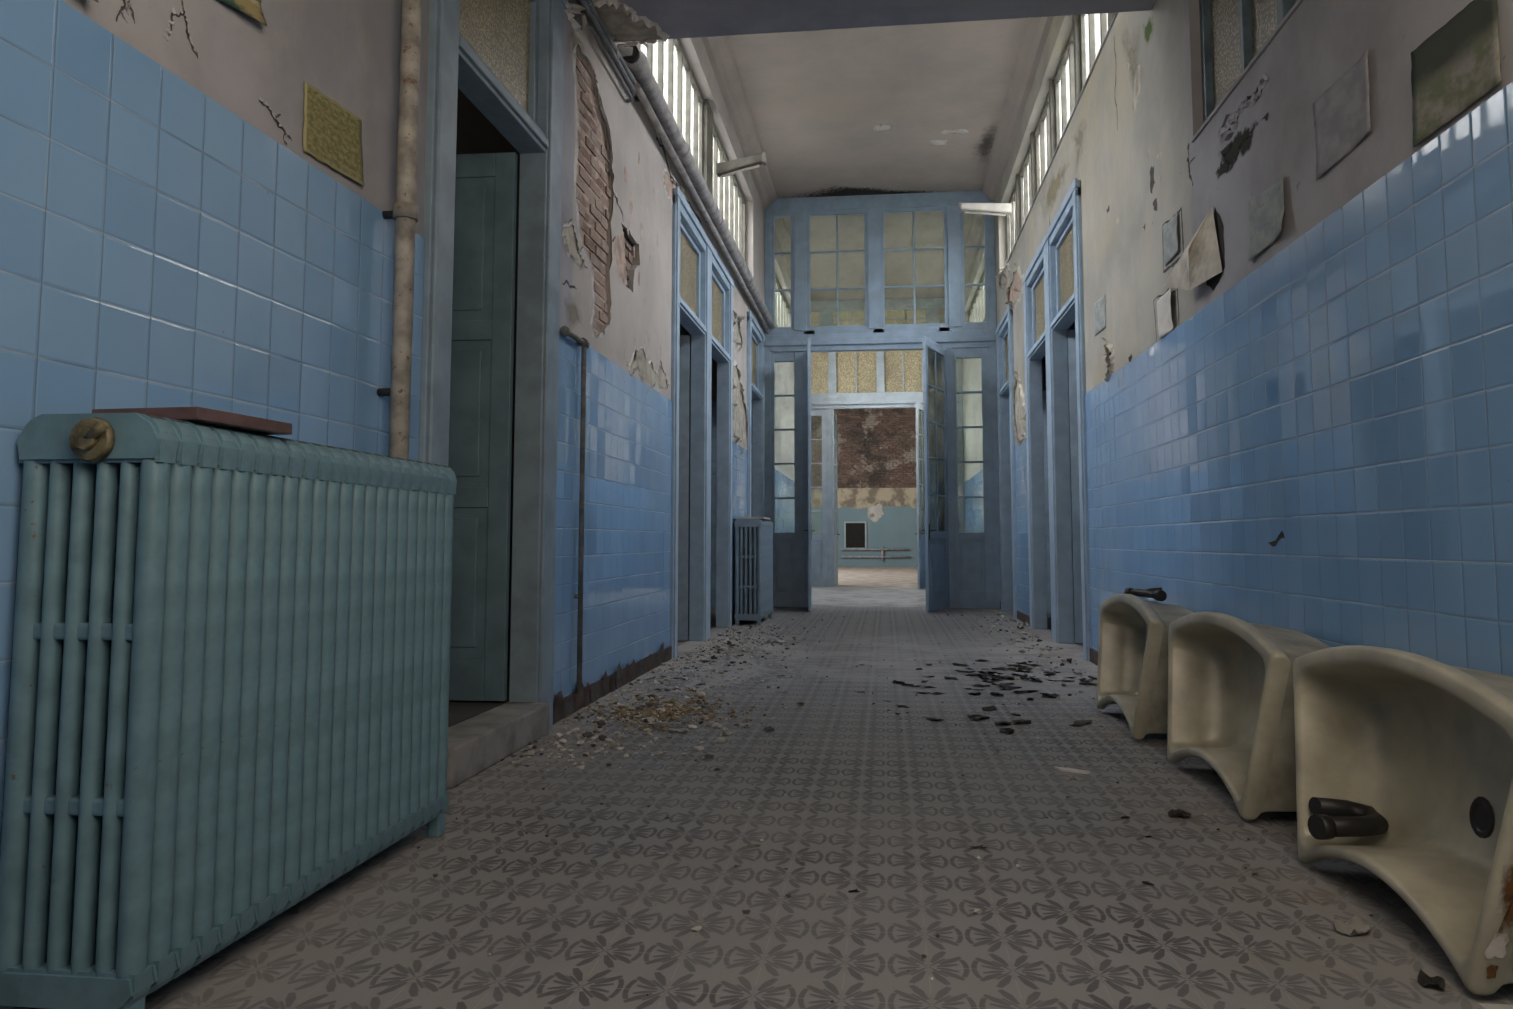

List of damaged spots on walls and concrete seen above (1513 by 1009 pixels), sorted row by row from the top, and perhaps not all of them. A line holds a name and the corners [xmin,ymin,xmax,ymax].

crack [116,0,199,58]
peeling [1218,73,1269,144]
flaking render [562,0,690,338]